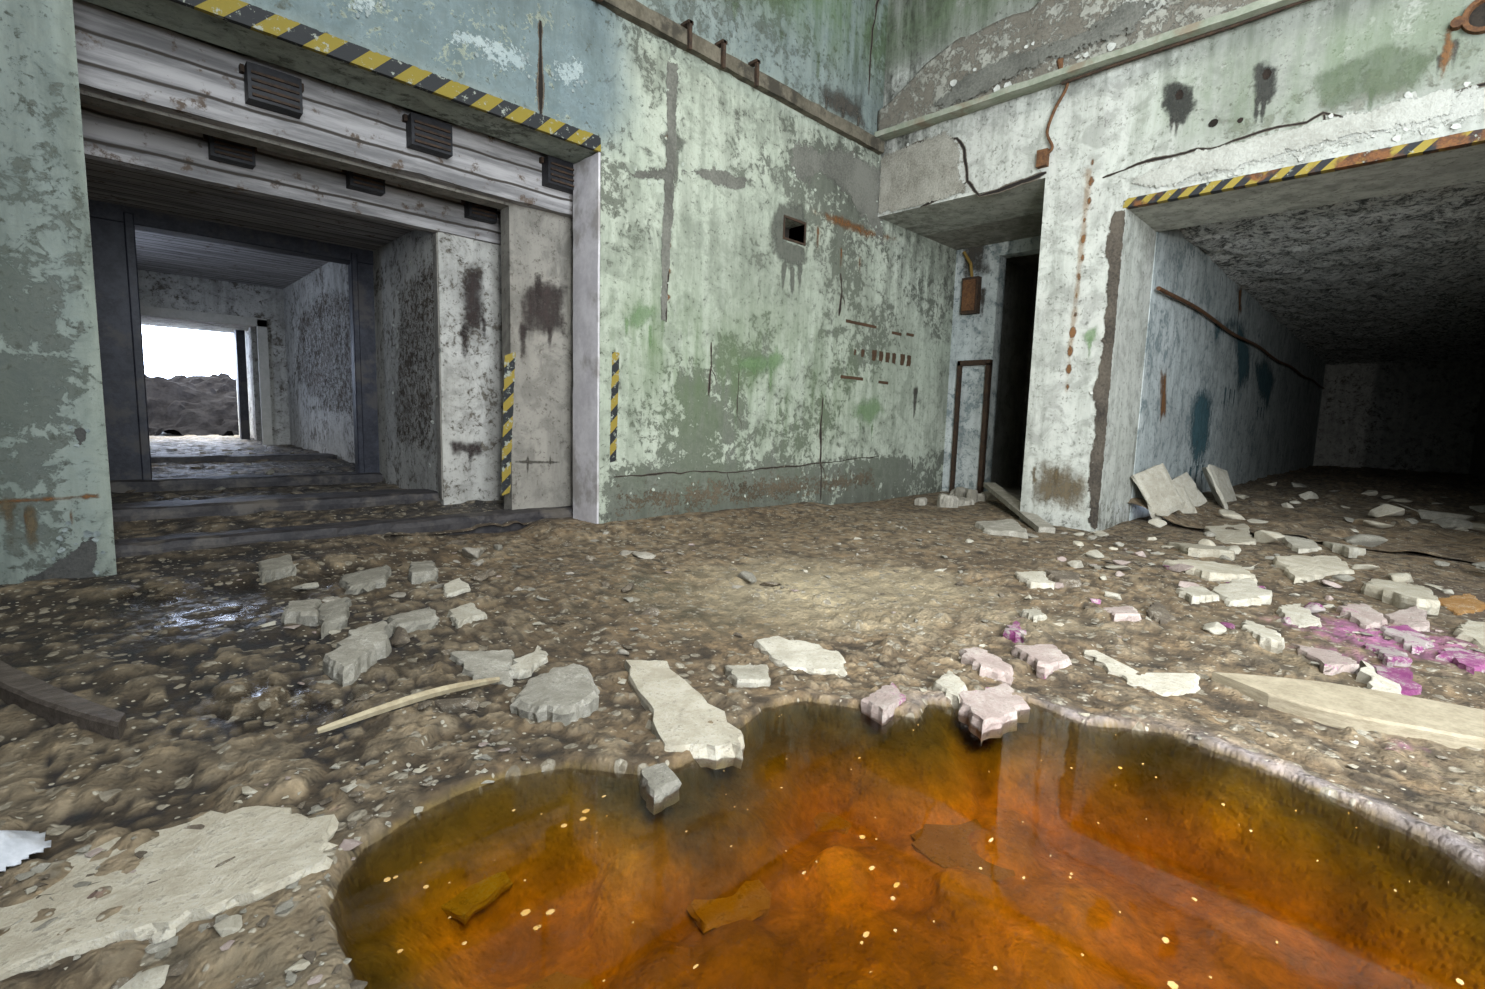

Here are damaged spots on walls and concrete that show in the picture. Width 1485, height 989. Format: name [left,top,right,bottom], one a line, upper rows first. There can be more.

peeling [348,0,386,19]
spalling [878,129,966,214]
spalling [933,0,1169,109]
water stain [1161,82,1195,133]
water stain [1254,63,1276,118]
peeling [1172,81,1485,189]
water stain [460,269,486,356]
water stain [520,276,564,354]
rust [0,494,98,524]